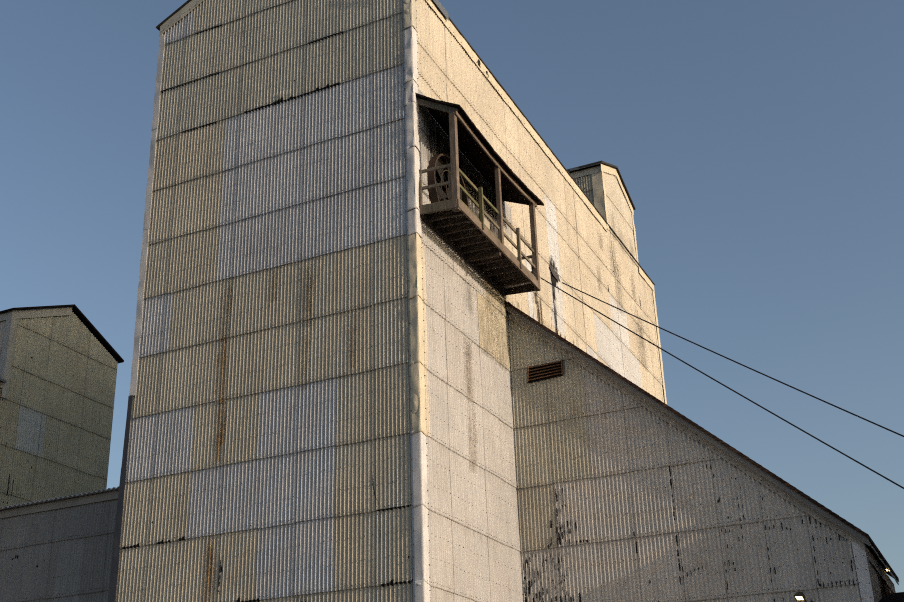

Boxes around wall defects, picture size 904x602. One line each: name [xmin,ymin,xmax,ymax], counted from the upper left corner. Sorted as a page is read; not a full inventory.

peeling [523,488,588,602]